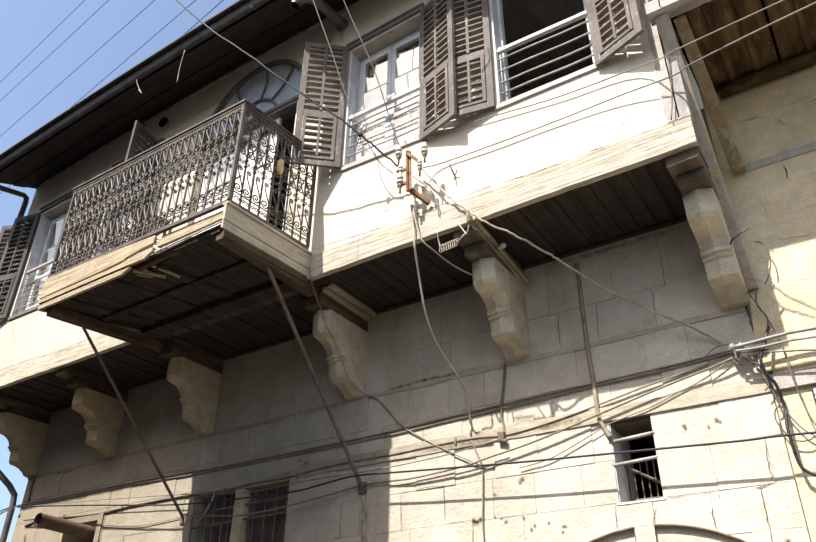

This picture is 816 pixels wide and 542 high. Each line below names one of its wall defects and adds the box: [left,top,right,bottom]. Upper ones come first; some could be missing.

crack [315,101,656,250]